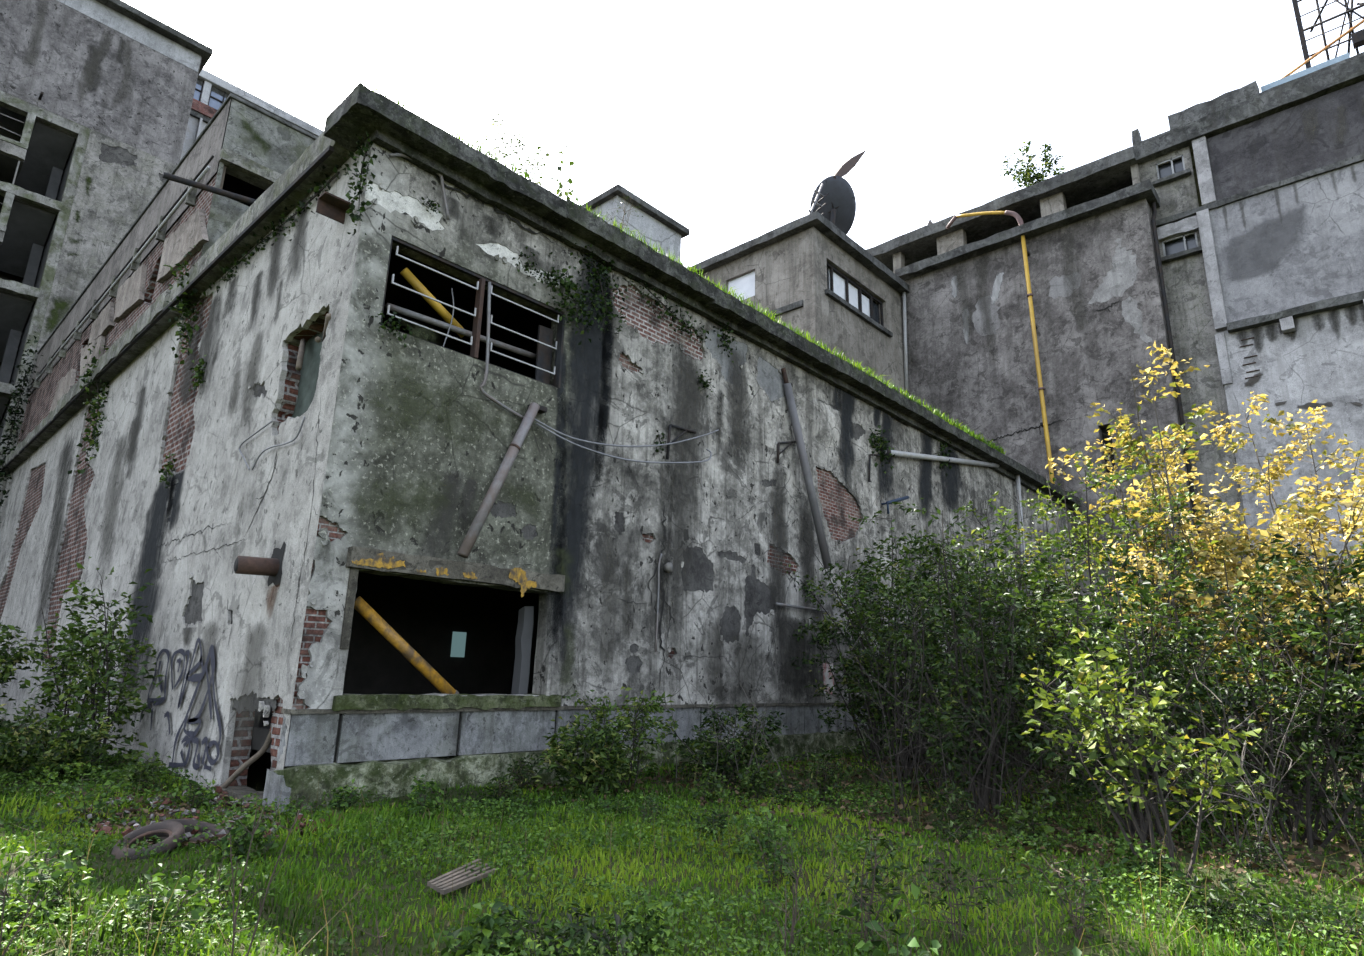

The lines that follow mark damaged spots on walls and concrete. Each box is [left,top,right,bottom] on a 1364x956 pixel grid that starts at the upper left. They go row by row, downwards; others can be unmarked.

peeling [365,179,444,231]
water stain [1226,209,1303,279]
spalling [159,292,213,472]
spalling [248,383,267,398]
spalling [277,309,329,434]
spalling [611,281,785,401]
spalling [0,460,46,620]
spalling [44,404,100,661]
water stain [547,254,613,670]
spalling [815,468,862,544]
spalling [228,598,331,770]